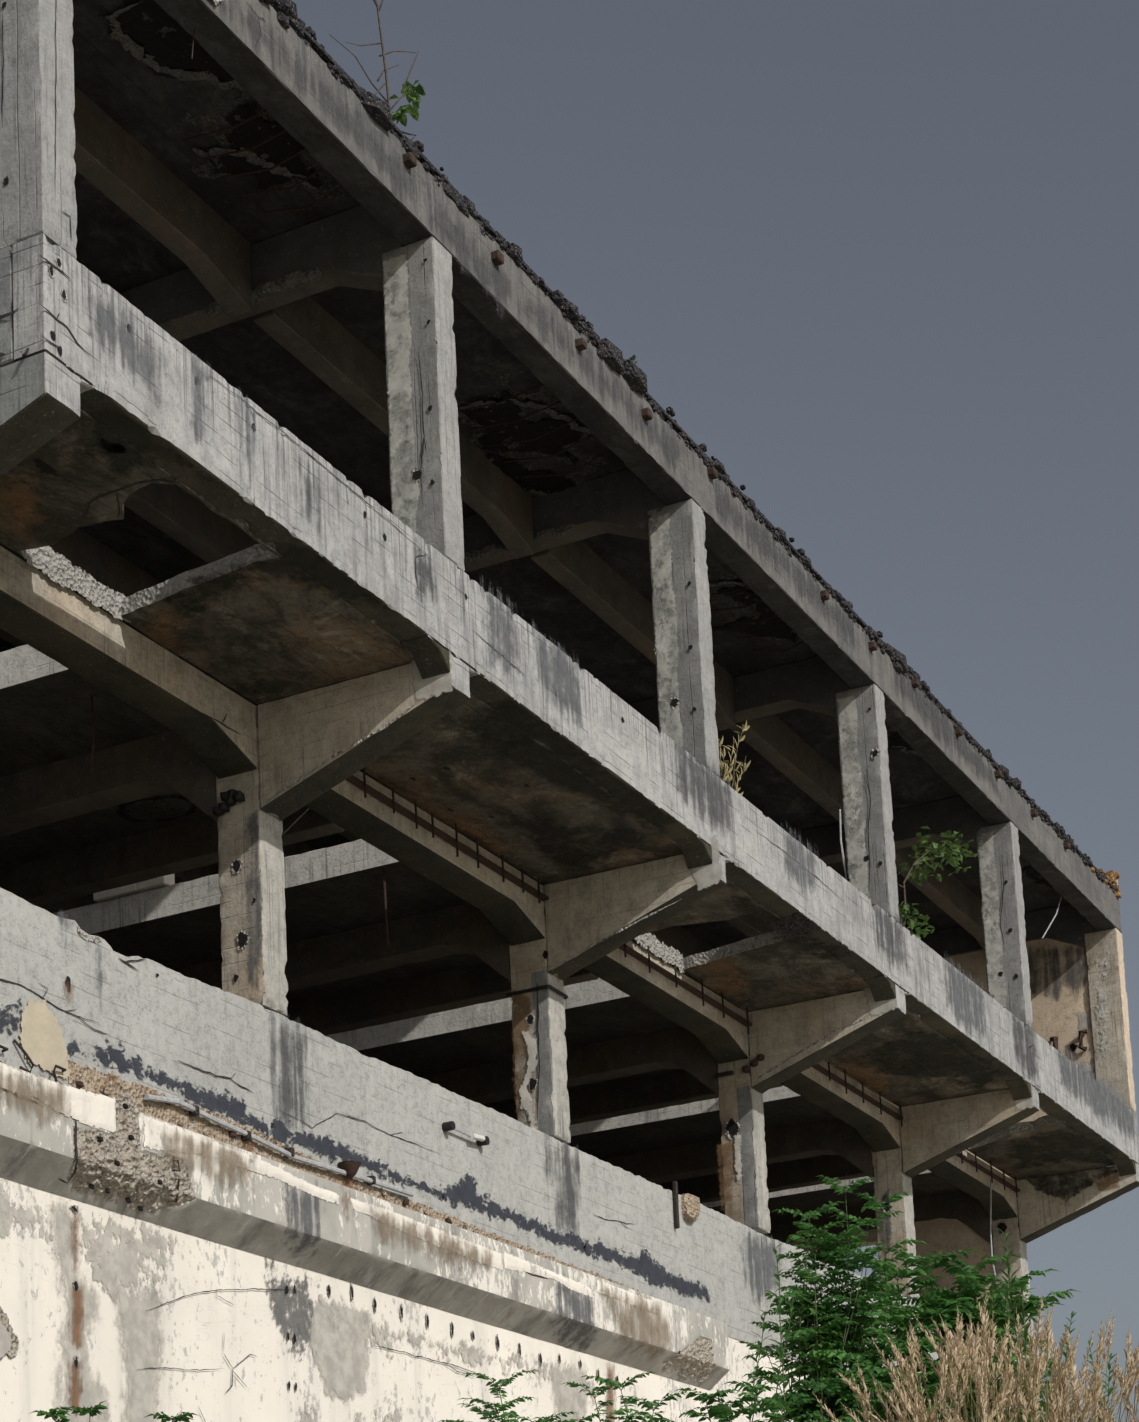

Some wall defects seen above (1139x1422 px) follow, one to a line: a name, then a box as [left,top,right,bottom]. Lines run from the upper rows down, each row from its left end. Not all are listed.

spalling [21,546,132,623]
damp [146,546,387,648]
crack [0,979,109,1035]
damp [271,1023,304,1124]
peeling [519,1014,538,1129]
damp [1029,946,1135,1138]
damp [284,1184,321,1252]
spalling [0,1059,658,1422]
damp [546,1143,580,1232]
damp [1010,1129,1119,1201]
rust [69,1287,84,1414]
crack [137,1346,257,1422]